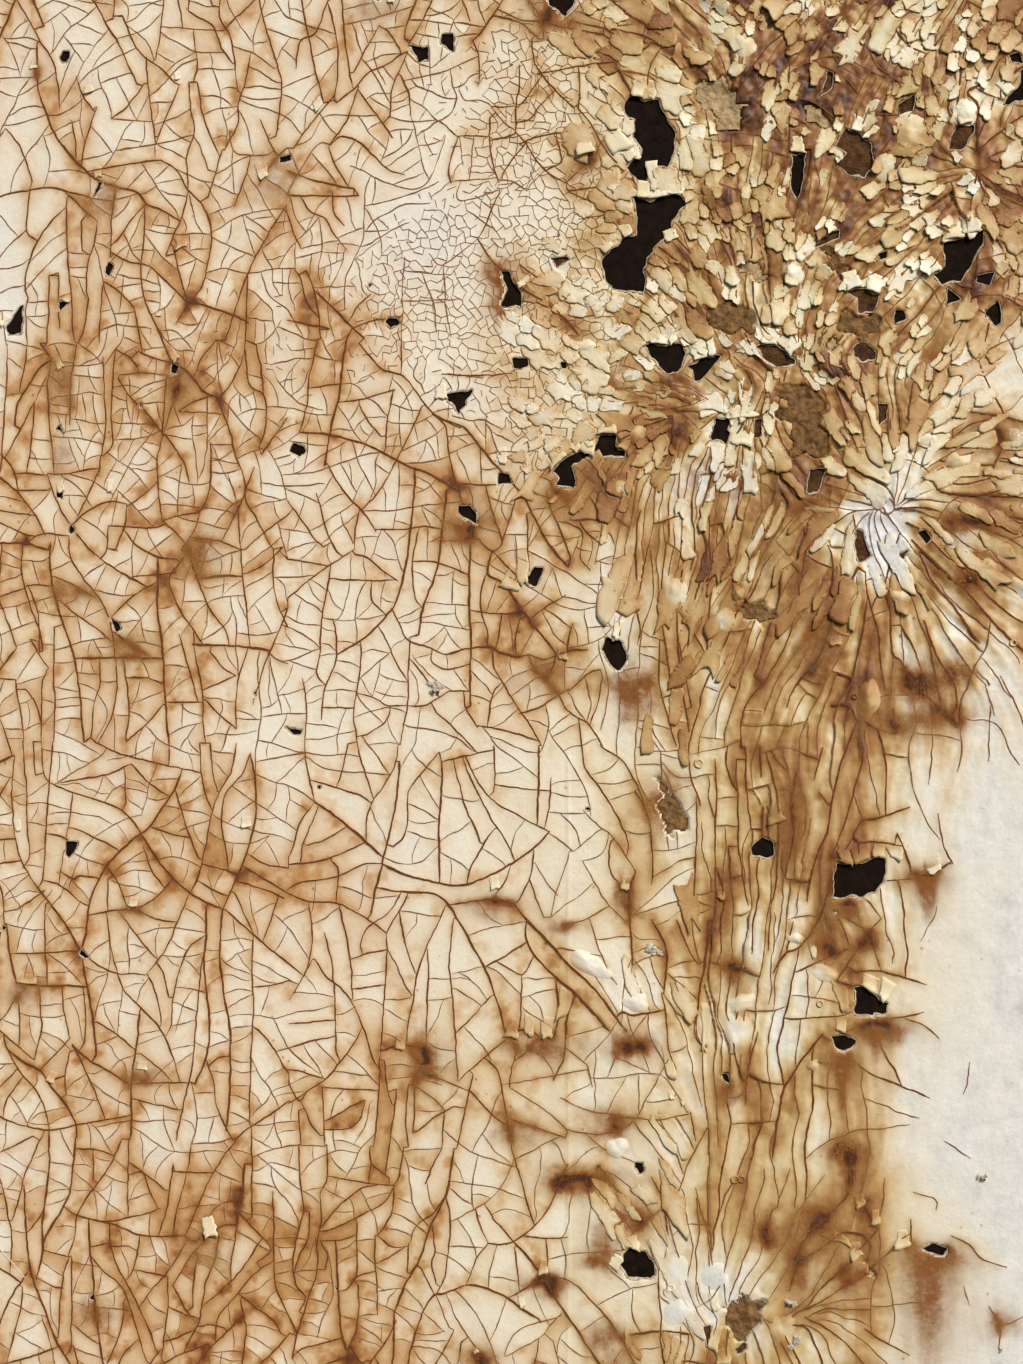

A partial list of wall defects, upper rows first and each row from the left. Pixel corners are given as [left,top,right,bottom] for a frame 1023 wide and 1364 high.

crack [653,165,736,298]
crack [696,0,1023,438]
peeling [493,0,1023,769]
corrosion [644,772,688,833]
peeling [832,837,904,914]
peeling [816,973,897,1054]
crack [893,1012,940,1039]
corrosion [585,1203,654,1270]
peeling [589,1090,747,1364]
crack [951,1235,1007,1268]
corrosion [726,1296,767,1341]
corrosion [905,1243,960,1346]